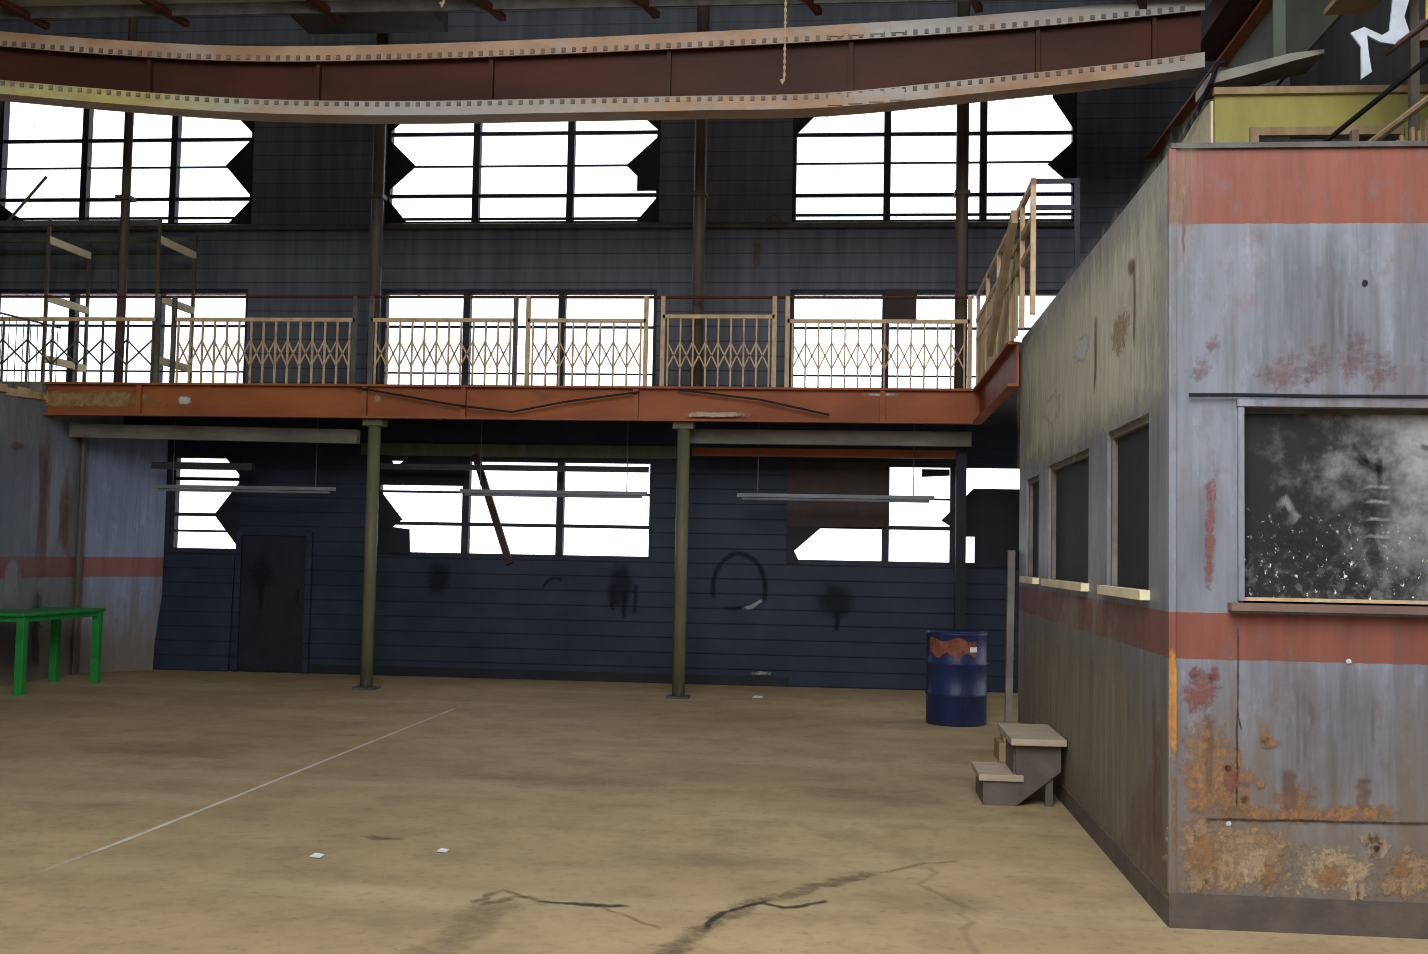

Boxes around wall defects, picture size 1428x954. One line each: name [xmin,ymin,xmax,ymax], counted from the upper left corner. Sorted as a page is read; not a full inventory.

corrosion [1205,481,1216,582]
corrosion [1168,649,1395,853]
peeling [1166,815,1428,902]
crack [541,900,626,908]
crack [658,875,867,954]